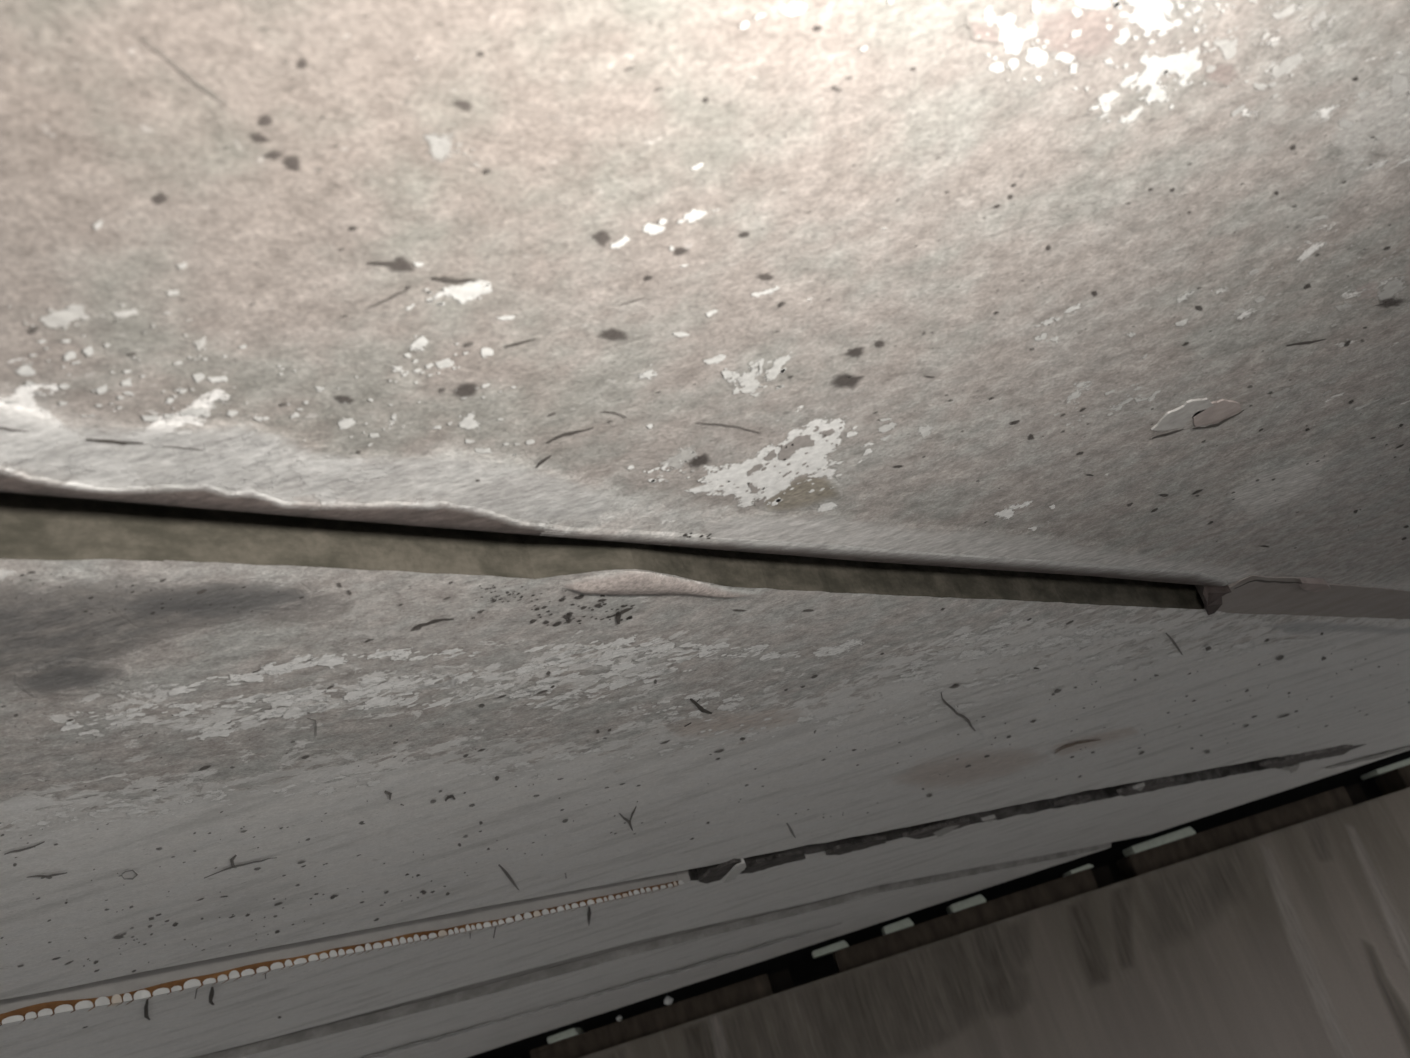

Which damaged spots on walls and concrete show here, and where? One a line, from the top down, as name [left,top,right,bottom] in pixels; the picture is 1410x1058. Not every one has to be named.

peeling [977,0,1348,125]
peeling [627,417,897,512]
leakage [0,560,363,710]
peeling [60,626,864,742]
crack [1055,739,1101,753]
corrosion [0,881,679,1026]